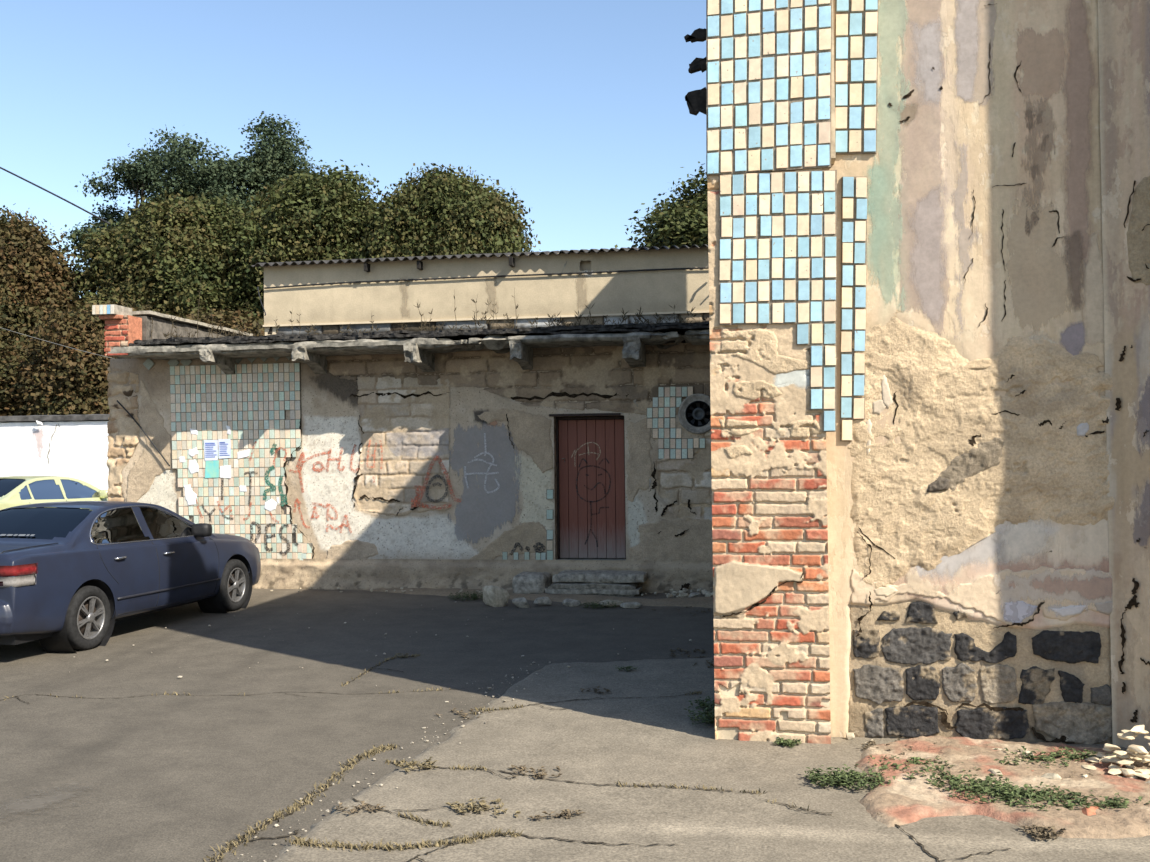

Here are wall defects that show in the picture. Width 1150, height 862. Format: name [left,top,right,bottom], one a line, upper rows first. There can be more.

peeling [1123,176,1150,285]
flaking render [106,367,140,501]
spalling [326,327,810,521]
flaking render [788,419,823,442]
flaking render [847,0,1115,745]
crack [1118,578,1150,723]